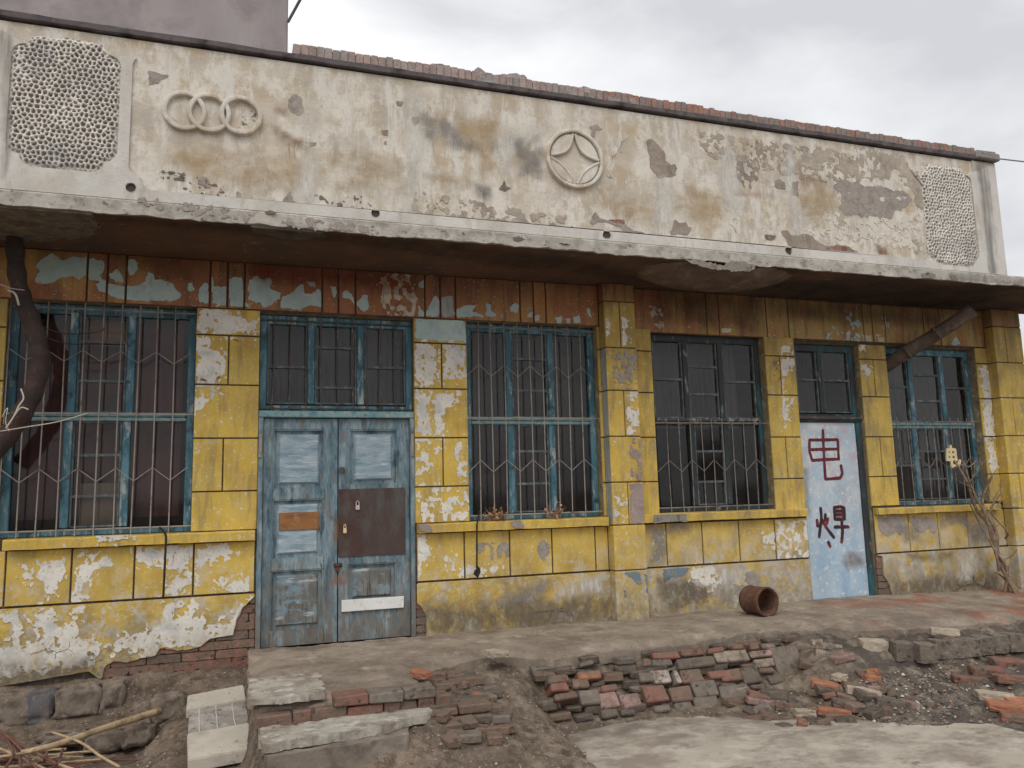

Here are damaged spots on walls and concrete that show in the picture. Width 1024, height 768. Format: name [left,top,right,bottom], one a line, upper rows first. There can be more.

peeling [161,170,378,240]
spalling [646,139,677,178]
spalling [699,131,926,254]
spalling [0,205,509,579]
peeling [605,314,761,600]
peeling [977,365,999,478]
peeling [760,519,809,562]
spalling [0,535,255,682]
damp [426,578,612,630]